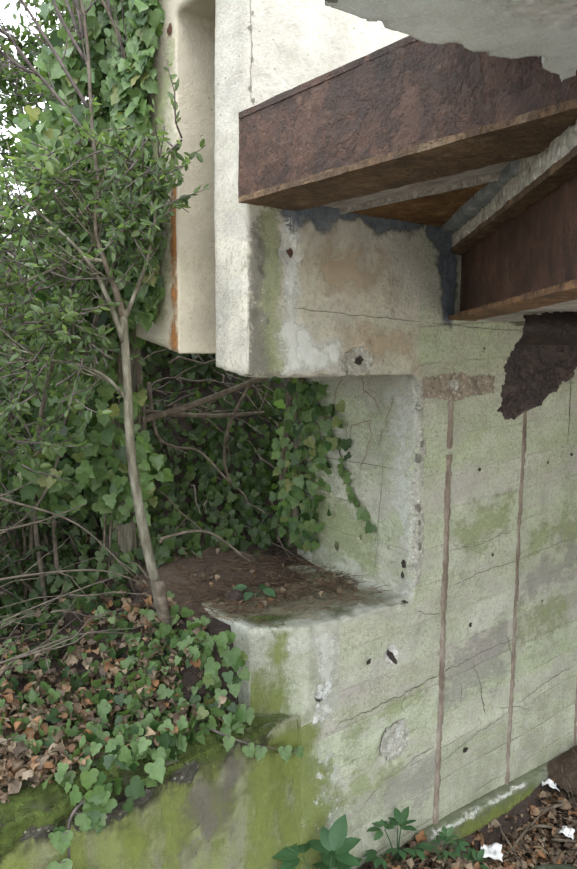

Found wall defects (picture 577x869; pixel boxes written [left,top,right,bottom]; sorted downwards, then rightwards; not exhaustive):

rust [170,187,178,350]
spalling [339,340,374,374]
water stain [275,206,458,376]
crack [281,306,523,332]
spalling [401,372,495,587]
crack [332,633,529,734]
water stain [20,817,81,842]
water stain [105,750,230,827]
water stain [313,755,344,830]